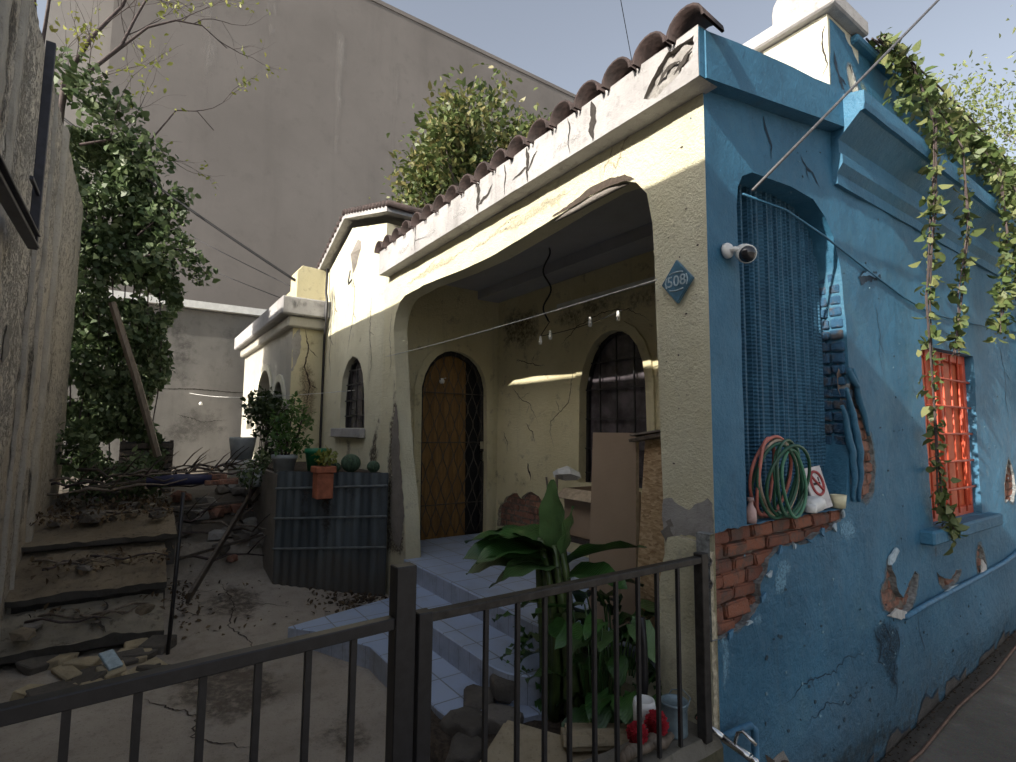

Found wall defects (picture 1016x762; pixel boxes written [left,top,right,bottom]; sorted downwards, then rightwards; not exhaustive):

spalling [837,367,889,505]
spalling [1004,458,1016,512]
spalling [660,498,855,680]
spalling [862,538,930,688]
spalling [937,569,962,591]
spalling [975,542,987,574]
crack [144,699,260,750]